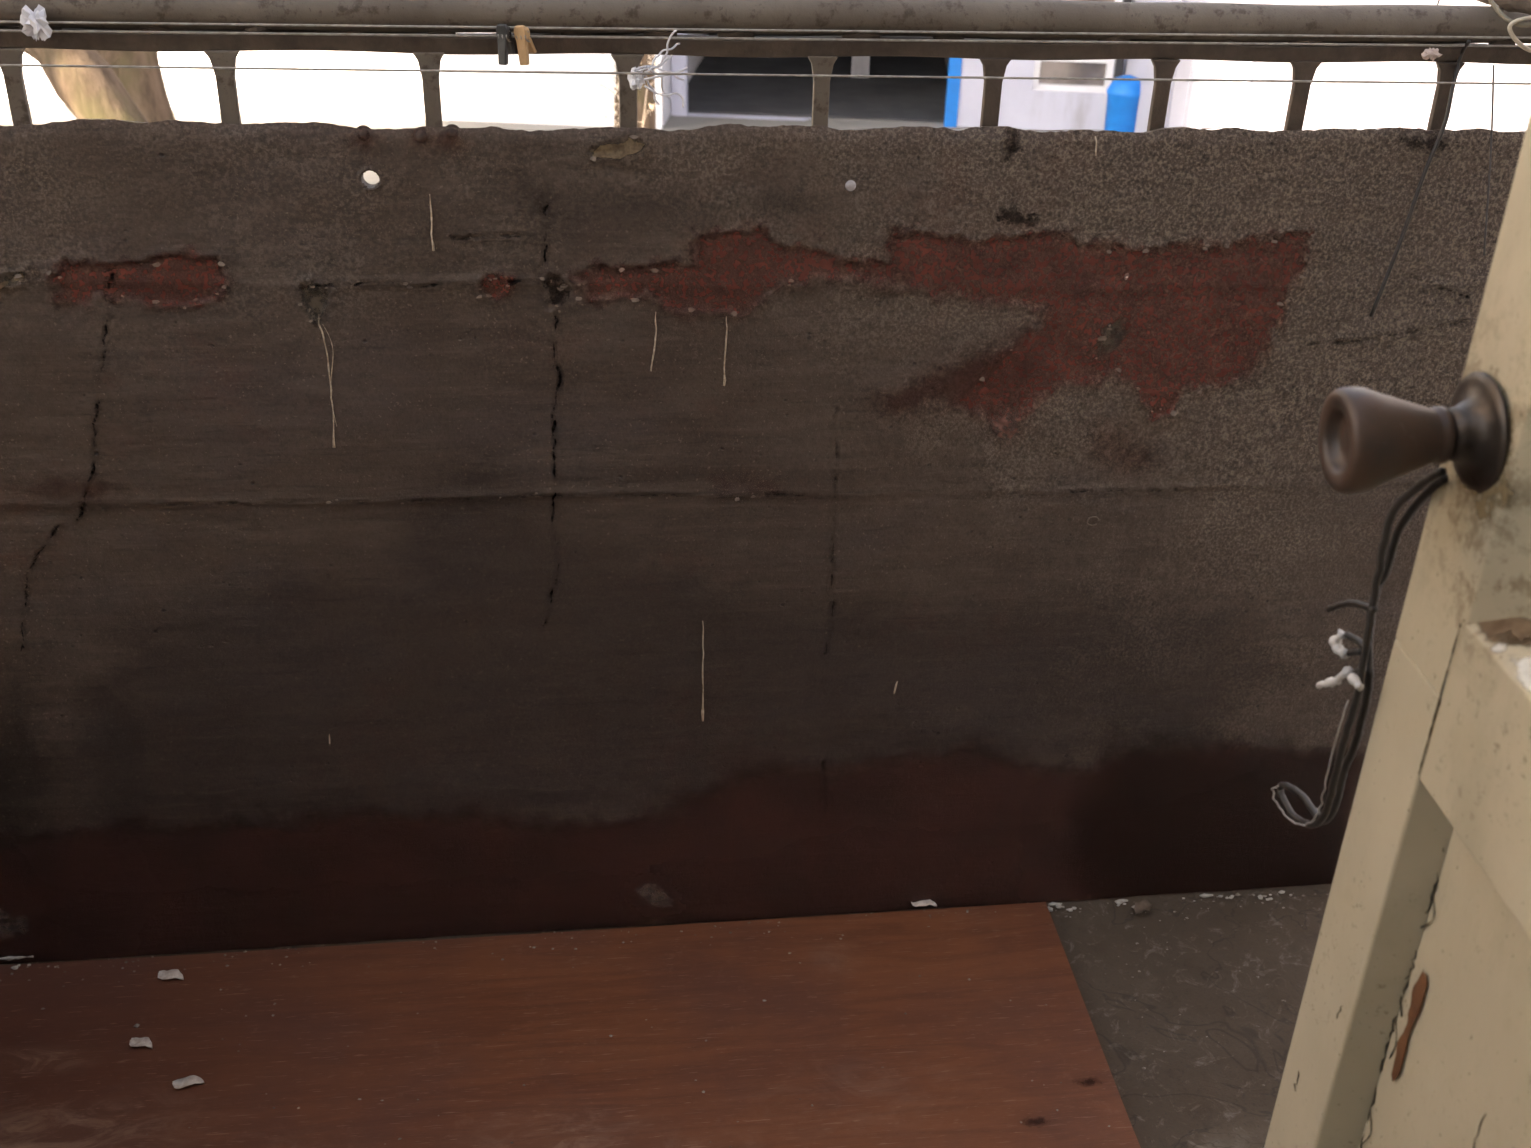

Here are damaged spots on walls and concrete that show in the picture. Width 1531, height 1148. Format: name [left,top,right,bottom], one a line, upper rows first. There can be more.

peeling [0,246,234,310]
peeling [540,208,1315,430]
crack [21,272,114,650]
crack [499,316,562,521]
peeling [1478,617,1531,691]
leakage [1084,752,1361,897]
peeling [1391,969,1427,1081]